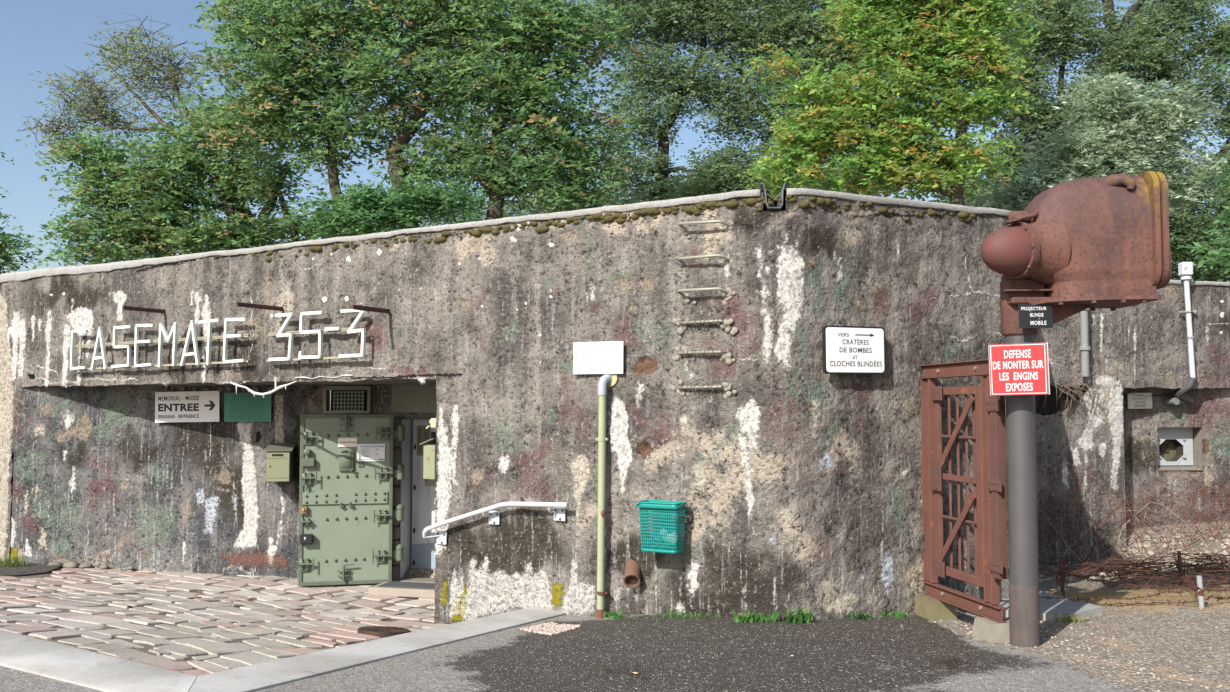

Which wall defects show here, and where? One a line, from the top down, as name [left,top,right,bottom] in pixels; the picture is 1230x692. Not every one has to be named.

water stain [196,489,219,534]
water stain [230,375,353,565]